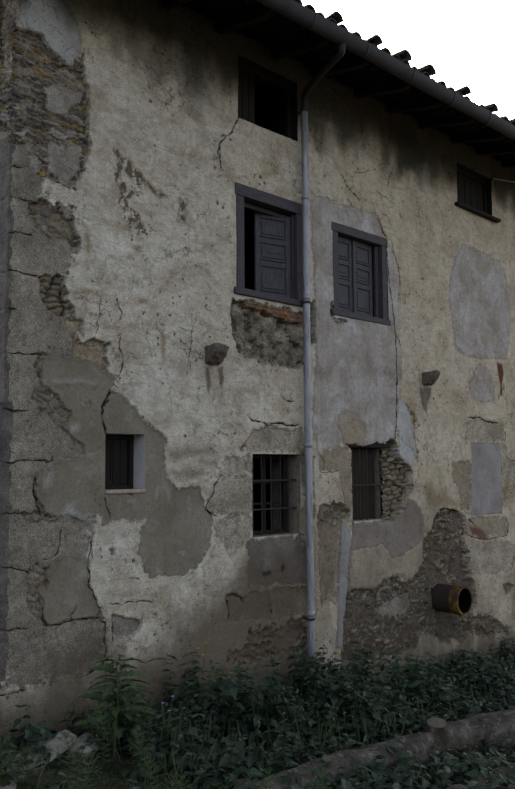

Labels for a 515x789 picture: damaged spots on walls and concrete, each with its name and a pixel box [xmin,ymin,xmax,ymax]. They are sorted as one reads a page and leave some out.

crack [217,119,238,168]
spalling [230,301,313,369]
spalling [5,142,139,690]
crack [250,418,298,426]